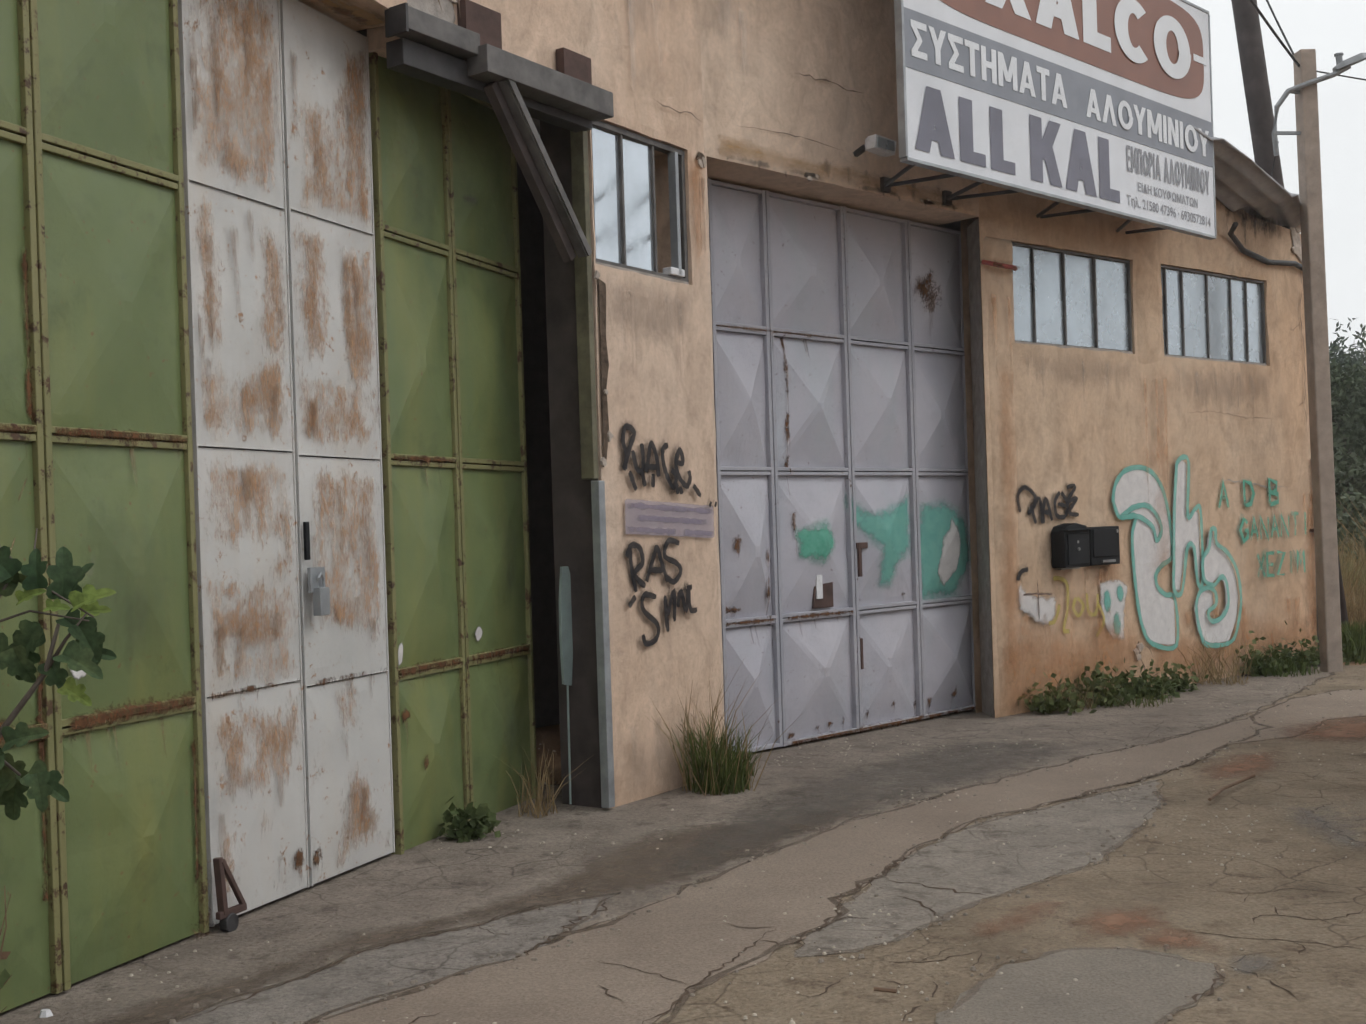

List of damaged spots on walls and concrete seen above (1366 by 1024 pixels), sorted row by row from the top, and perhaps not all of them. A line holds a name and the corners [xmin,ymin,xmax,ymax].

corrosion [192,0,274,184]
corrosion [292,60,368,218]
spalling [407,0,458,24]
crack [795,73,861,93]
corrosion [205,240,283,437]
corrosion [306,254,374,441]
corrosion [914,270,942,312]
corrosion [56,428,188,448]
corrosion [209,467,292,699]
corrosion [320,473,379,628]
corrosion [70,692,194,735]
corrosion [294,848,322,869]